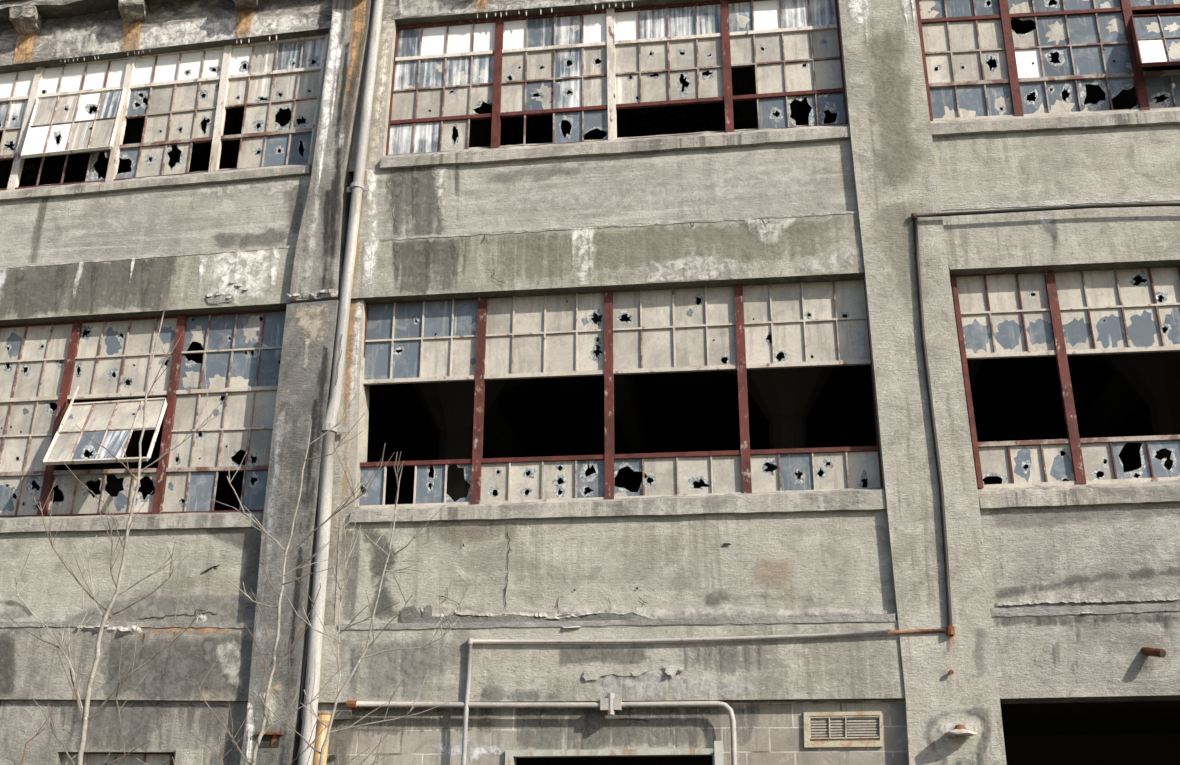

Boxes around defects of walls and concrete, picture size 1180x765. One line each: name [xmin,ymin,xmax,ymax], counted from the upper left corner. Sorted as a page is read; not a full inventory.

rust [14,33,37,63]
rust [122,21,141,51]
rust [236,8,254,37]
rust [346,0,366,110]
damp [197,12,363,304]
damp [350,0,574,408]
damp [0,198,176,317]
damp [572,228,594,285]
damp [646,256,745,282]
damp [342,517,397,621]
peeling [400,605,663,628]
peeling [994,595,1180,613]